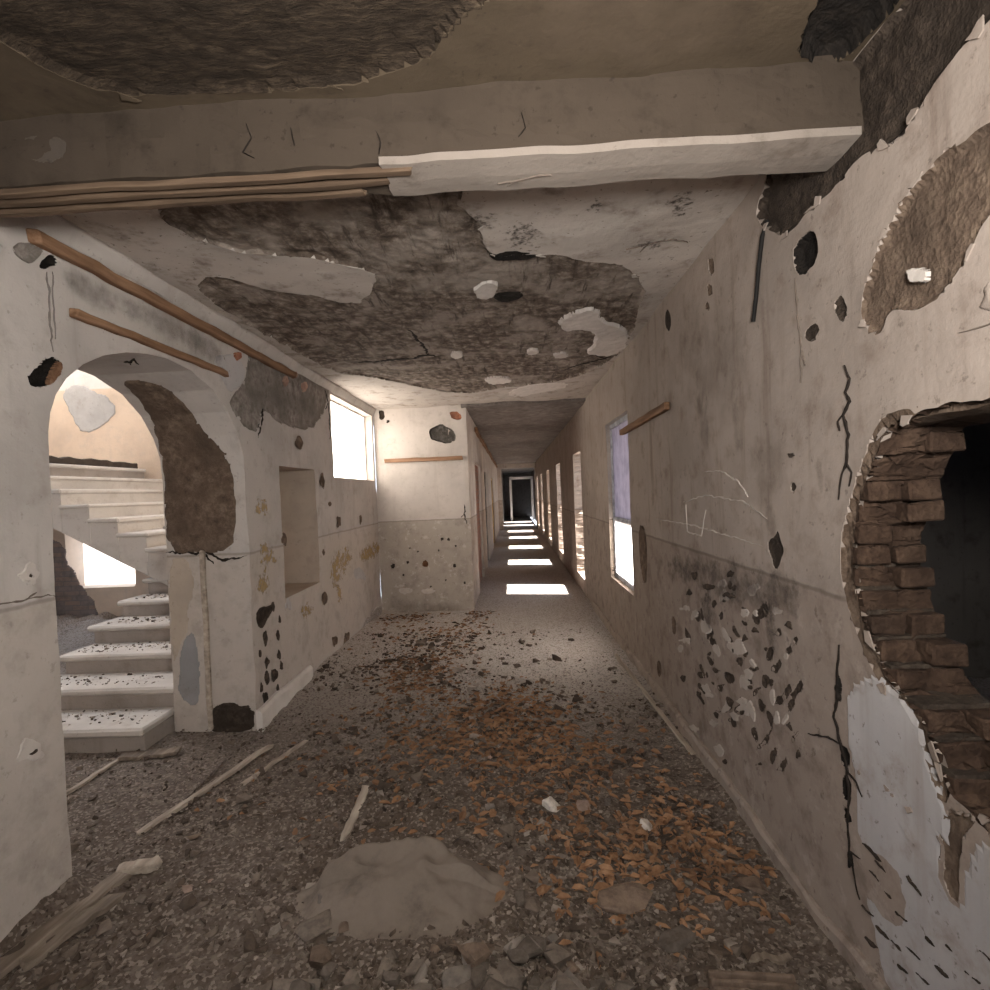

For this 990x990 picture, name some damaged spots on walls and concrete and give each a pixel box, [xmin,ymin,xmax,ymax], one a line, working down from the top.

spalling [158,191,646,393]
crack [794,278,806,383]
spalling [757,0,990,275]
spalling [858,123,990,335]
spalling [124,380,236,554]
crack [837,365,853,500]
flaking render [53,540,98,618]
spalling [210,703,255,732]
spalling [256,602,283,703]
spalling [672,570,803,771]
crack [808,645,862,900]
peeling [841,406,990,990]